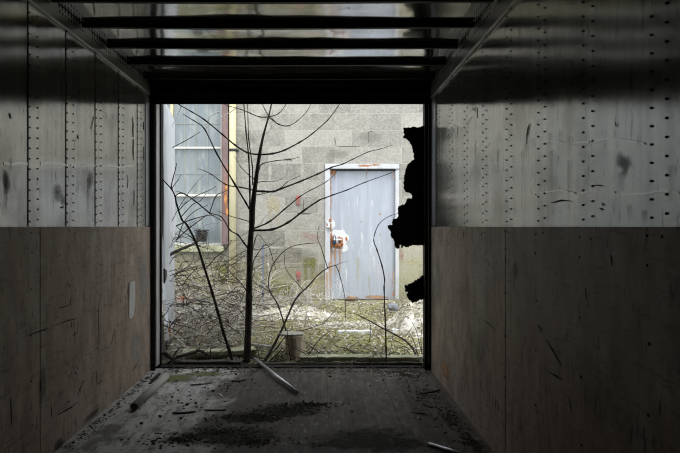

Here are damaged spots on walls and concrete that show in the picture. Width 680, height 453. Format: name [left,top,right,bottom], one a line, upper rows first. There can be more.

rust [326,233,347,292]